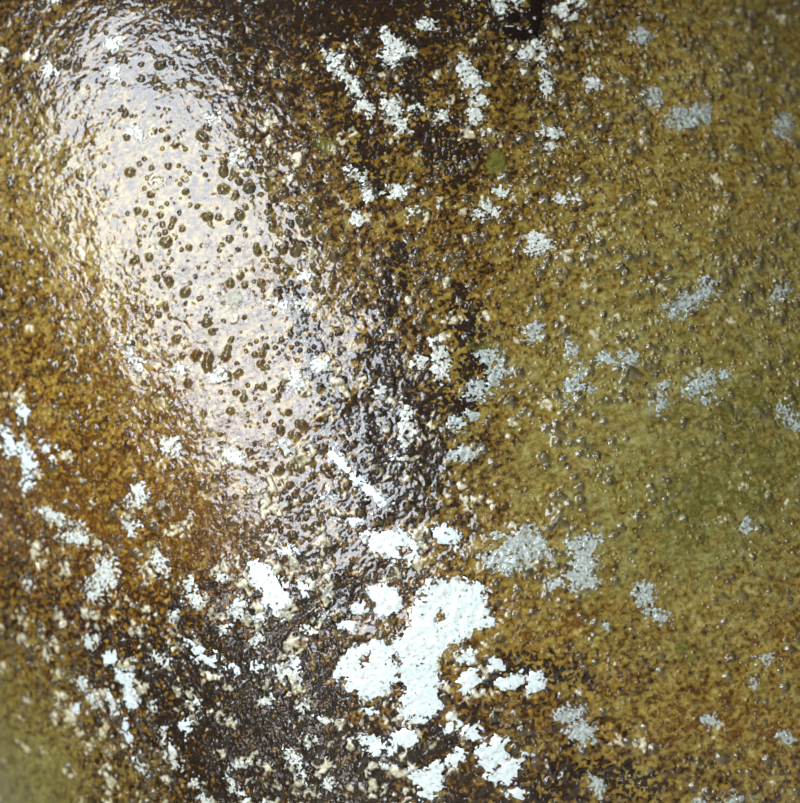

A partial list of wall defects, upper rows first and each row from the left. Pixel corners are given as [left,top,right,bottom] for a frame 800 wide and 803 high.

water stain [63,0,581,213]
water stain [270,233,498,553]
water stain [642,370,787,555]
water stain [71,567,669,803]